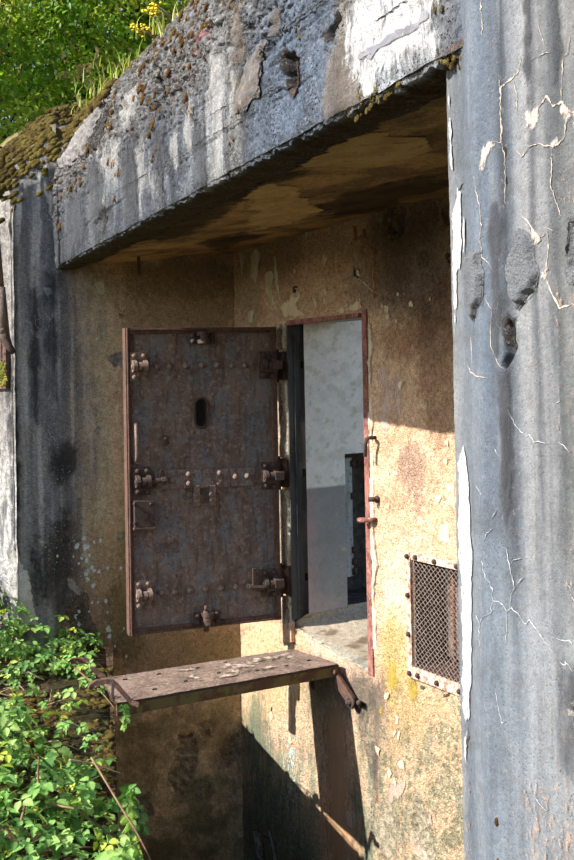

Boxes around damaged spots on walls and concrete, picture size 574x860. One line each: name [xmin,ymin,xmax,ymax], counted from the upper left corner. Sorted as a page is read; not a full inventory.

peeling [233,32,270,114]
spalling [279,46,301,99]
water stain [61,160,105,258]
water stain [121,143,136,225]
water stain [189,123,205,186]
water stain [140,159,311,251]
water stain [314,175,449,219]
crack [467,22,574,378]
water stain [28,273,61,422]
spalling [501,312,518,352]
crack [476,488,574,672]